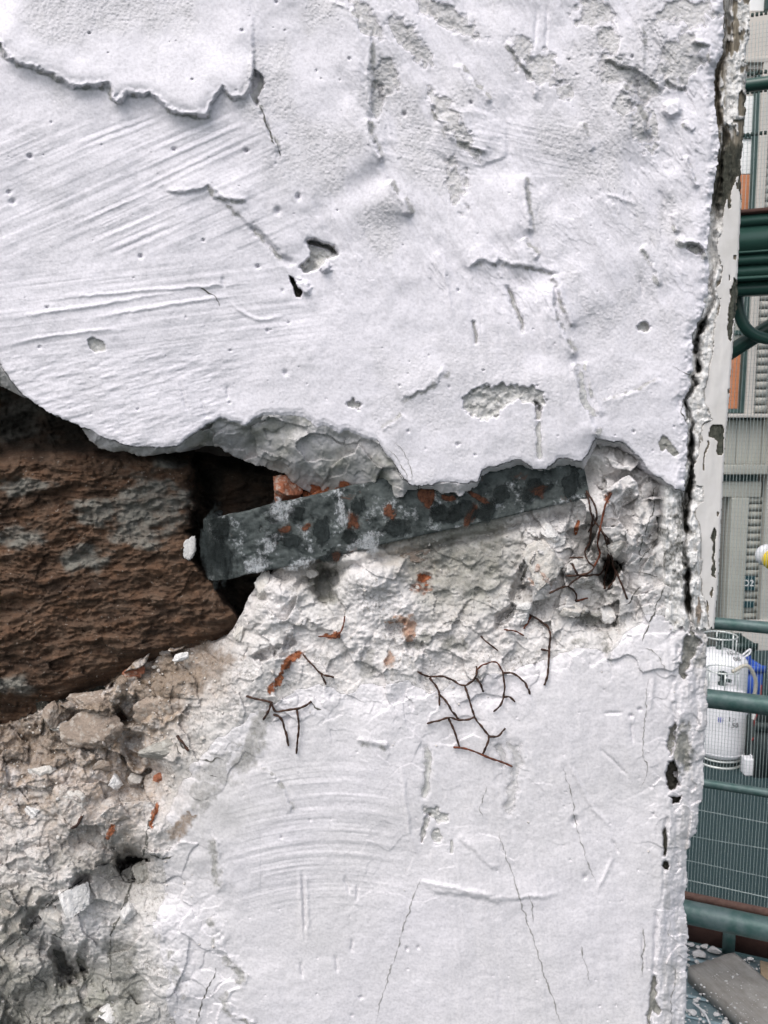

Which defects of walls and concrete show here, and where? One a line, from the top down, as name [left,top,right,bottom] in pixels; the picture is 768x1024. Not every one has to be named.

crack [715,2,726,80]
spalling [300,238,338,273]
spalling [0,364,27,398]
spalling [82,382,684,498]
rust [303,481,350,497]
rust [417,488,455,508]
spalling [183,536,196,561]
spalling [679,630,702,679]
crack [660,829,668,856]
crack [479,791,561,1022]
crack [377,882,420,1018]
spalling [646,976,661,1024]